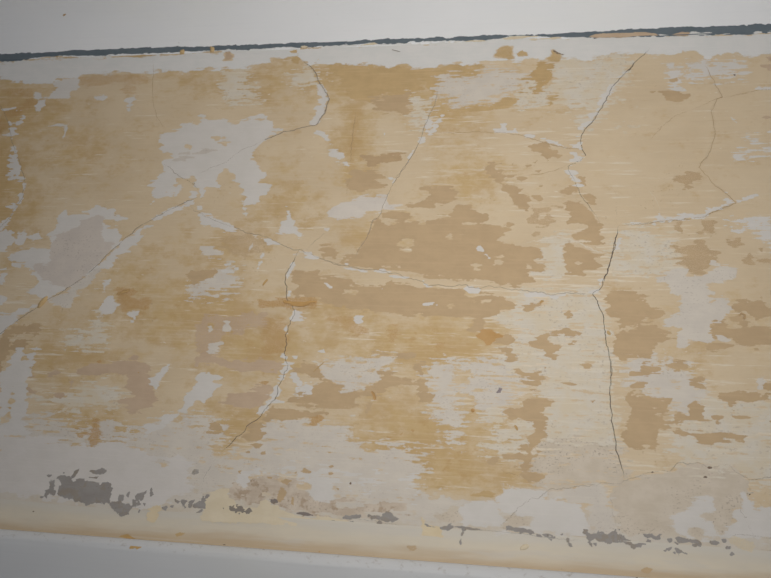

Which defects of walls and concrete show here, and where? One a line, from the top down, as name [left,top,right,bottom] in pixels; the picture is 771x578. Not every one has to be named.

peeling [0,23,771,64]
peeling [326,63,485,115]
peeling [452,50,564,113]
flaking render [147,114,283,216]
peeling [283,130,605,333]
flaking render [0,205,210,517]
peeling [141,351,435,455]
flaking render [223,465,410,524]
crack [0,62,769,521]
peeling [529,310,582,360]
flaking render [424,334,771,556]
flaking render [603,220,771,450]